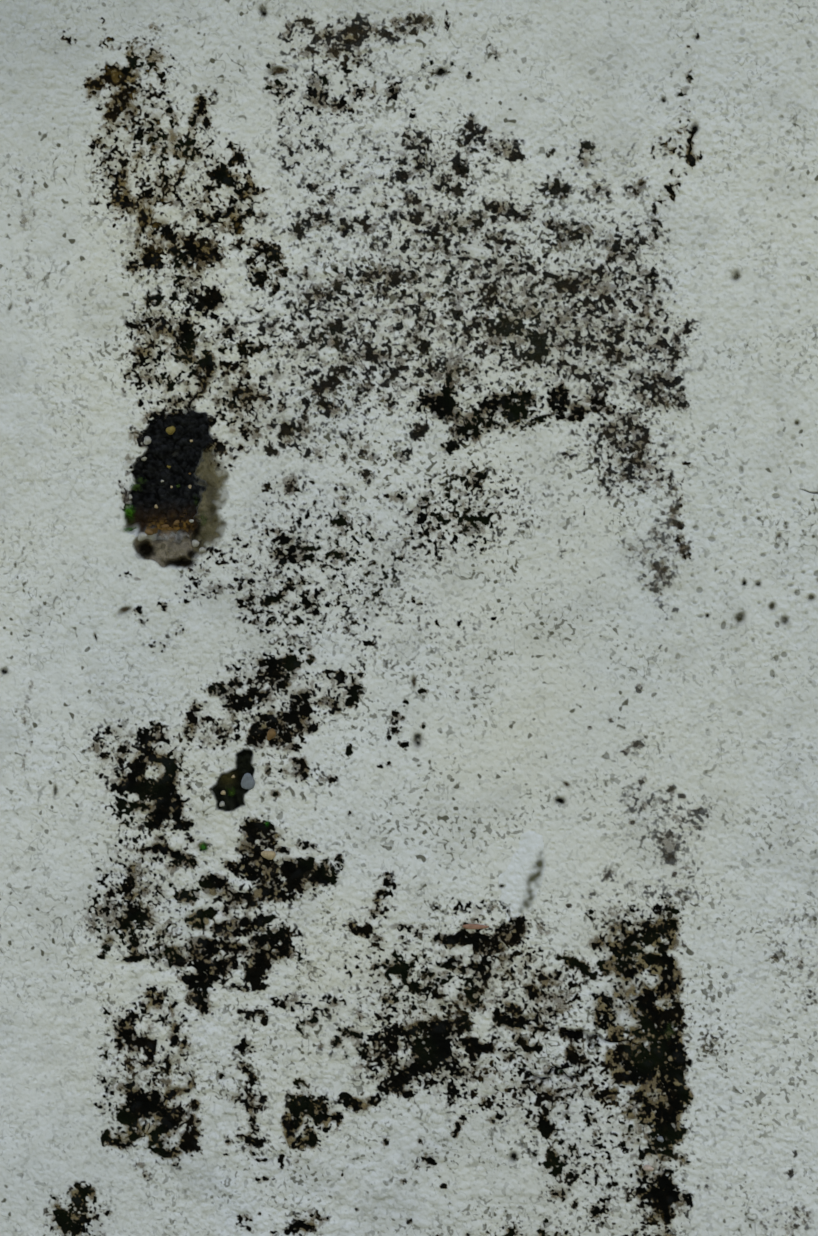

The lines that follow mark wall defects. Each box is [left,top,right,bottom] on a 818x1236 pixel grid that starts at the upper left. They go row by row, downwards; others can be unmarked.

spalling [124,409,228,567]
leakage [83,10,707,1236]
leakage [44,1181,110,1236]